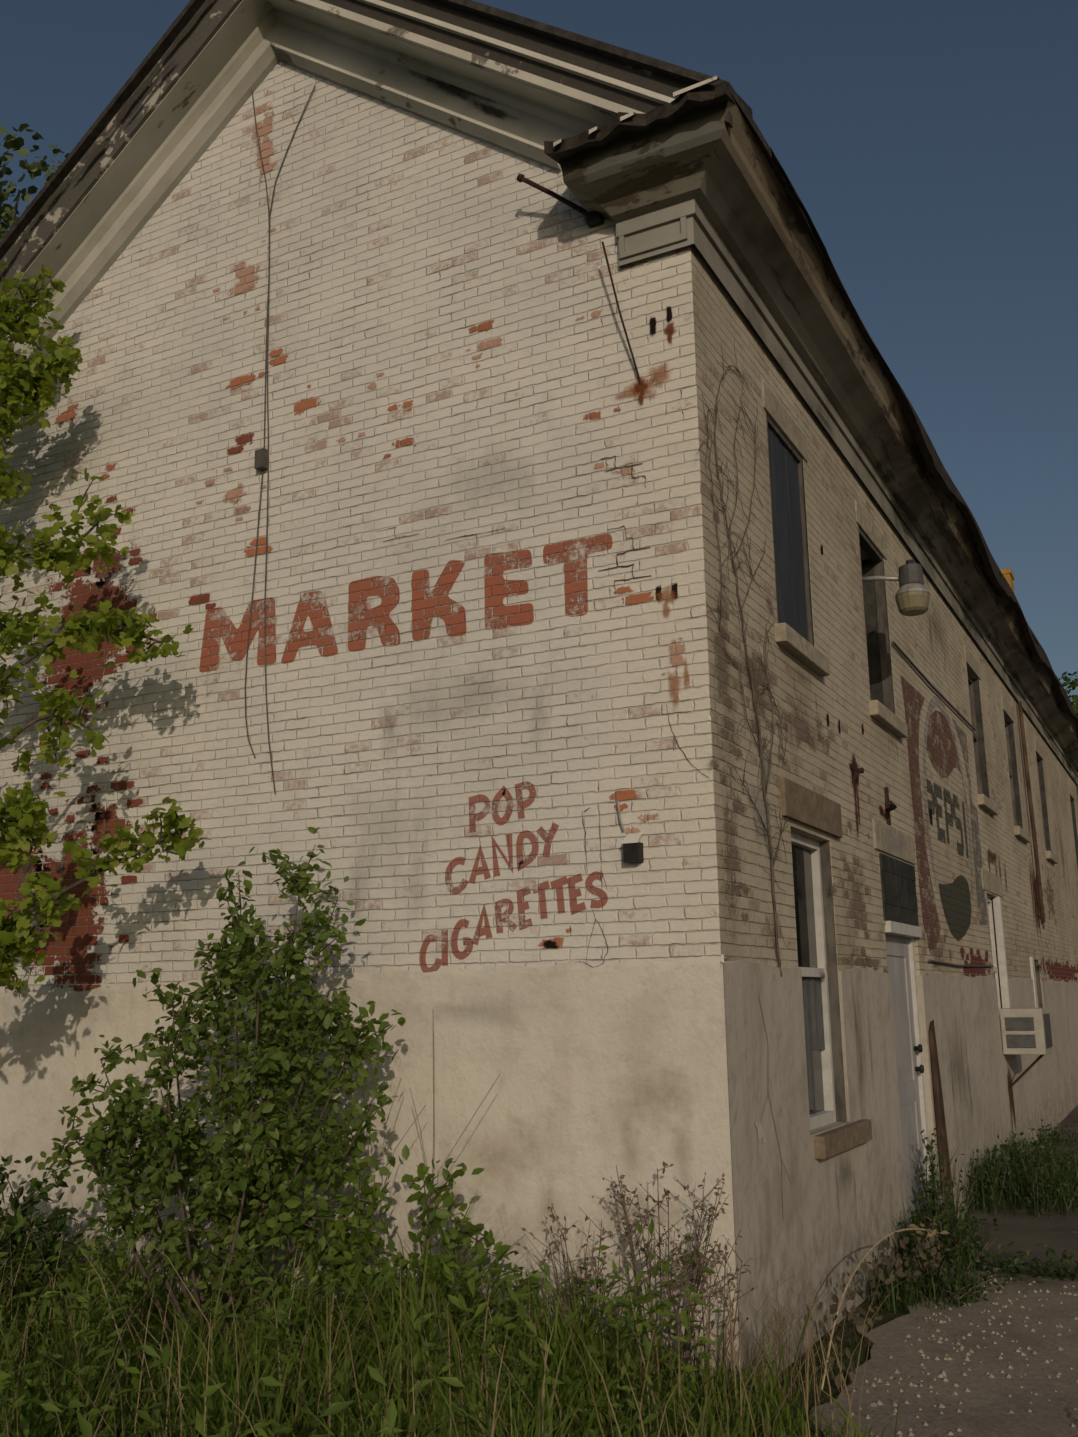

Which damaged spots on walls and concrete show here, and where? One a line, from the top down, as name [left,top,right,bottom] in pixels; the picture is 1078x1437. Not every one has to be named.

peeling [0,0,213,276]
peeling [254,90,277,182]
peeling [213,262,259,295]
peeling [226,348,288,390]
peeling [292,385,321,416]
corrosion [618,365,667,404]
peeling [383,437,417,459]
peeling [41,545,156,725]
peeling [75,749,109,764]
peeling [40,773,52,789]
corrosion [852,773,860,834]
peeling [0,781,144,992]